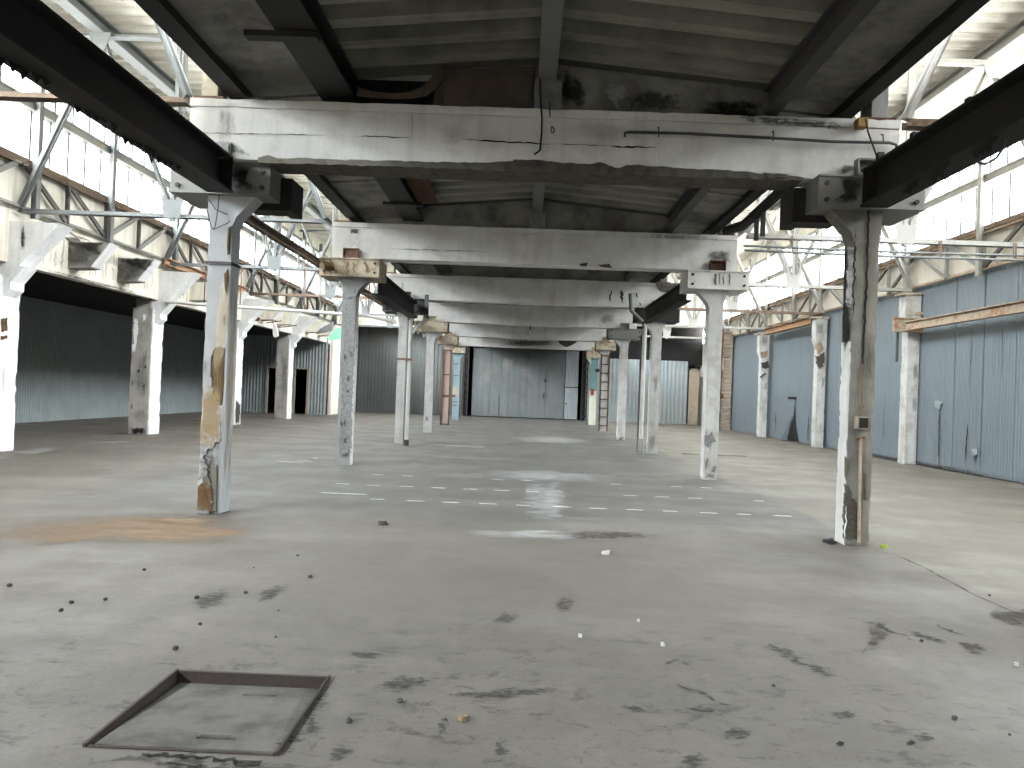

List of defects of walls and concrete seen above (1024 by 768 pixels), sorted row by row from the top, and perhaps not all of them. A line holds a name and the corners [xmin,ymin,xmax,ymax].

crack [210,129,306,137]
crack [359,114,413,138]
crack [463,139,657,158]
corrosion [324,259,368,273]
spalling [202,347,225,405]